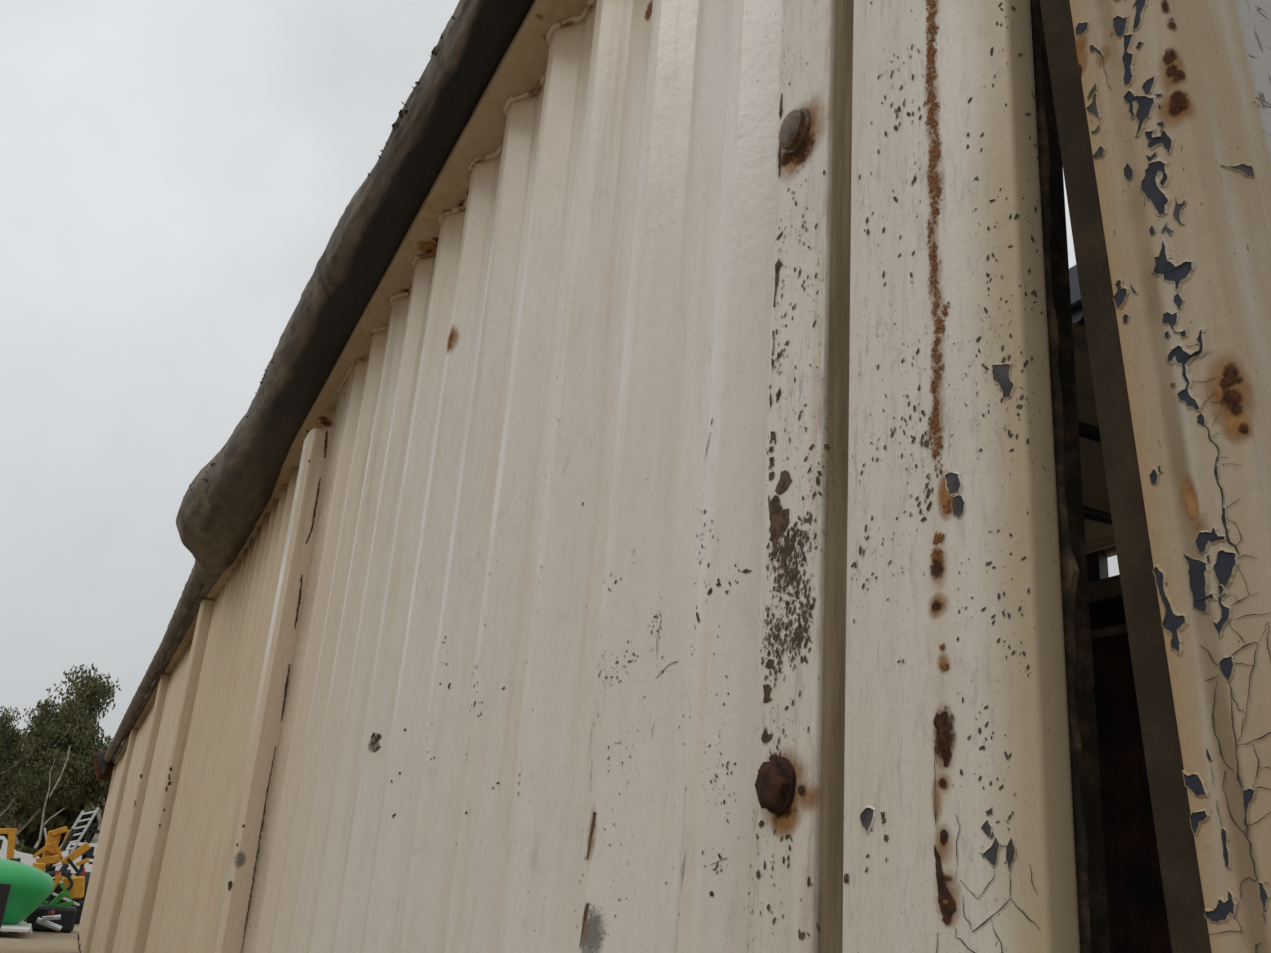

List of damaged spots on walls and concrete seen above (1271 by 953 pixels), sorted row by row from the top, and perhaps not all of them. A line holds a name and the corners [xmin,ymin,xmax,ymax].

corrosion [778,107,816,176]
corrosion [1162,49,1192,121]
corrosion [925,0,950,473]
peeling [1075,0,1207,427]
corrosion [1210,362,1249,438]
peeling [1152,525,1241,657]
crack [1186,344,1271,953]
peeling [844,804,890,842]
corrosion [933,706,956,953]
crack [955,814,1039,953]
peeling [1182,747,1213,836]
peeling [1204,888,1238,925]